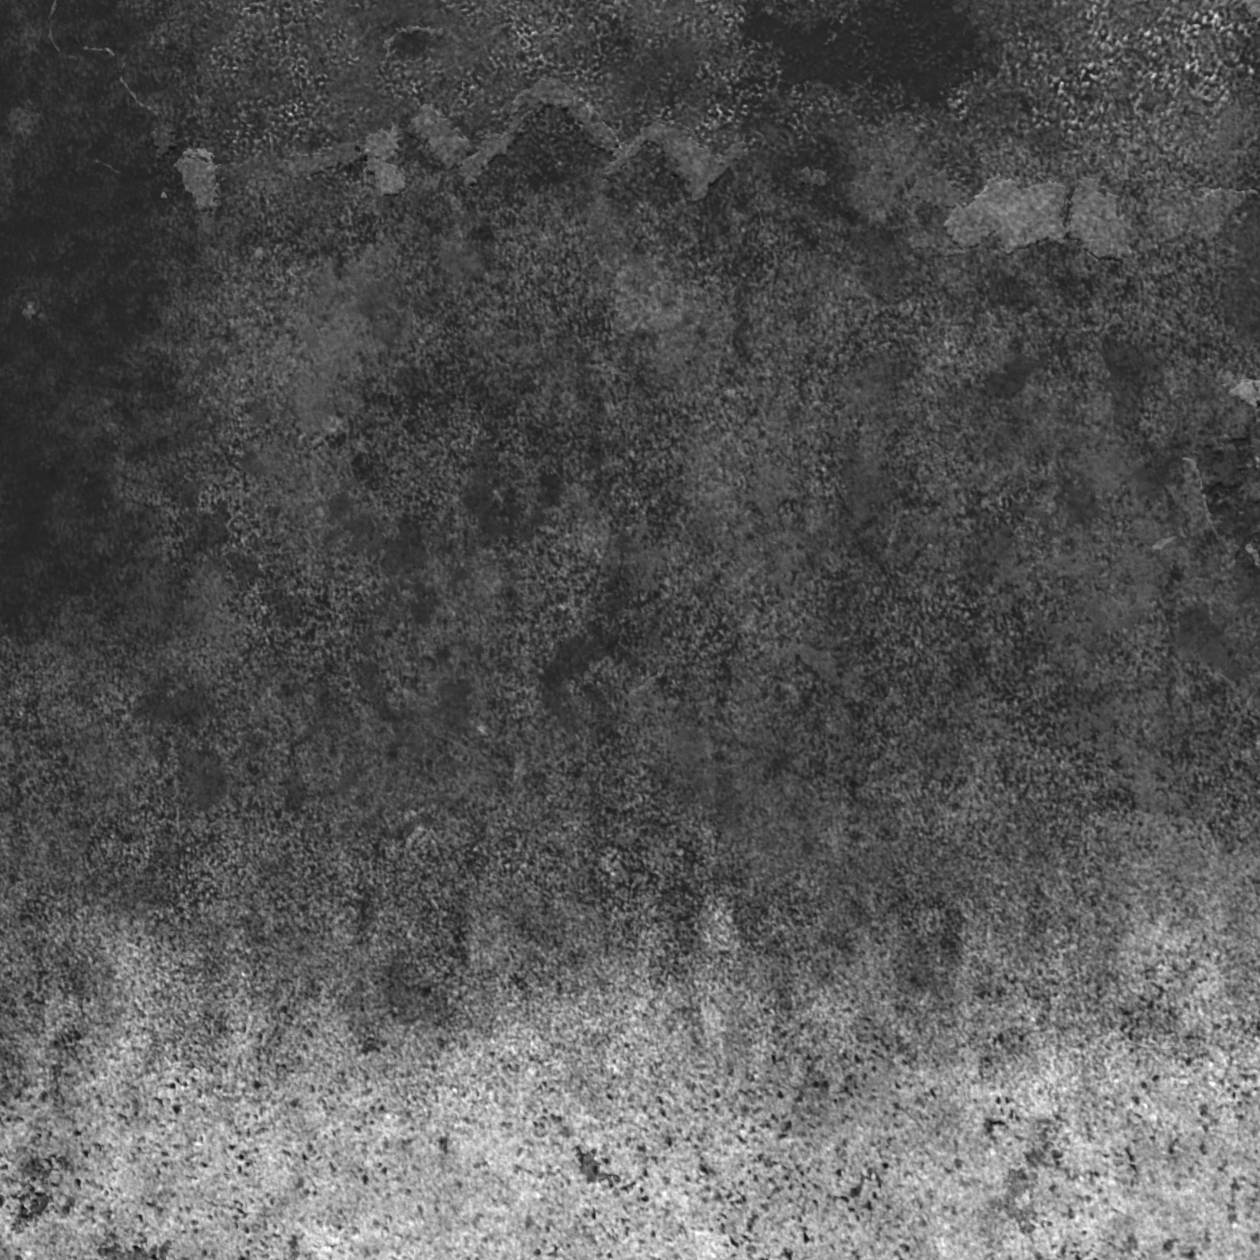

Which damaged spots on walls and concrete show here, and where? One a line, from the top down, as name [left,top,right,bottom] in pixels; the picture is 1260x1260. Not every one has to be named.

flaking render [151,79,749,251]
flaking render [793,167,830,186]
flaking render [908,172,1132,259]
crack [1199,187,1260,196]
spalling [1176,368,1260,578]